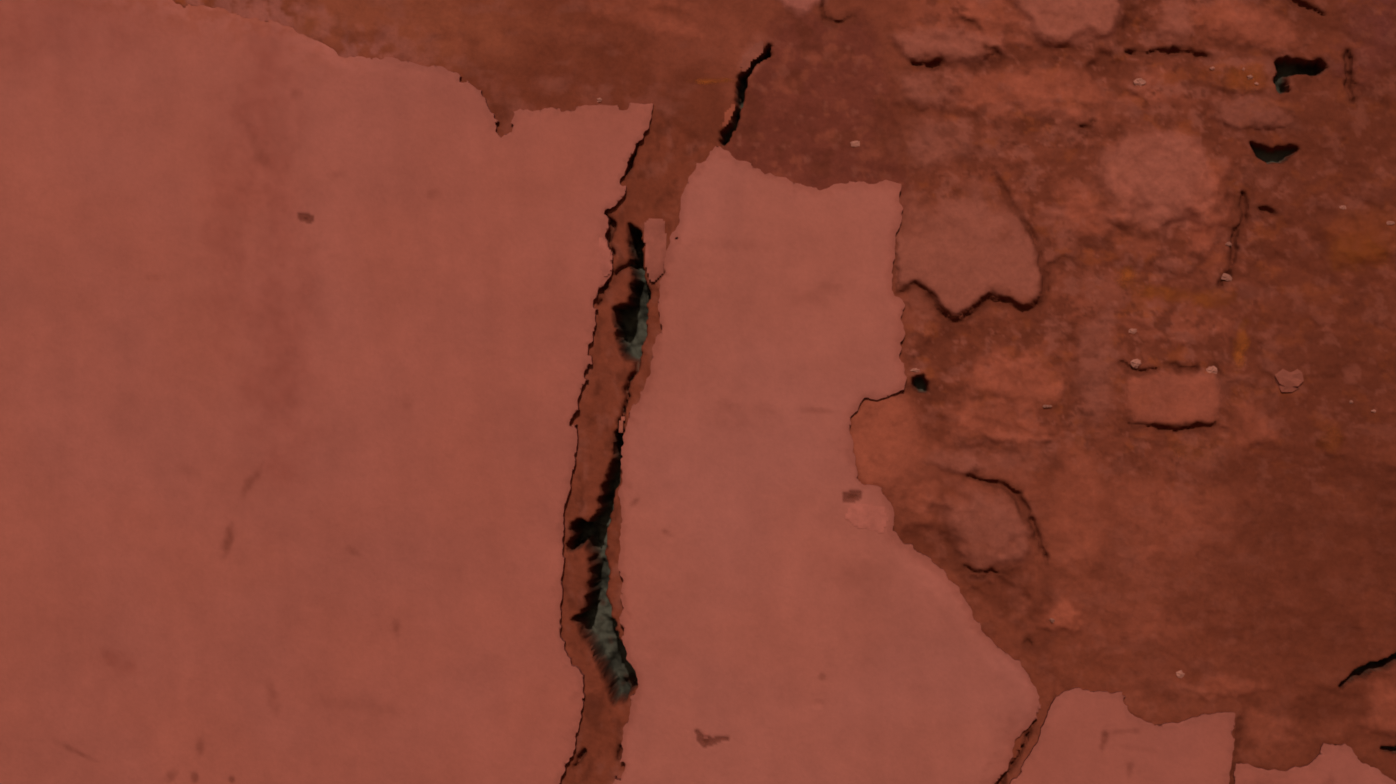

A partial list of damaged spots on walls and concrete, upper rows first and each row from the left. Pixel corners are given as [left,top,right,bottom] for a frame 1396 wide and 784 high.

flaking render [173,0,905,190]
crack [560,41,771,784]
flaking render [845,0,1396,782]
crack [995,701,1052,784]
crack [1229,718,1249,784]